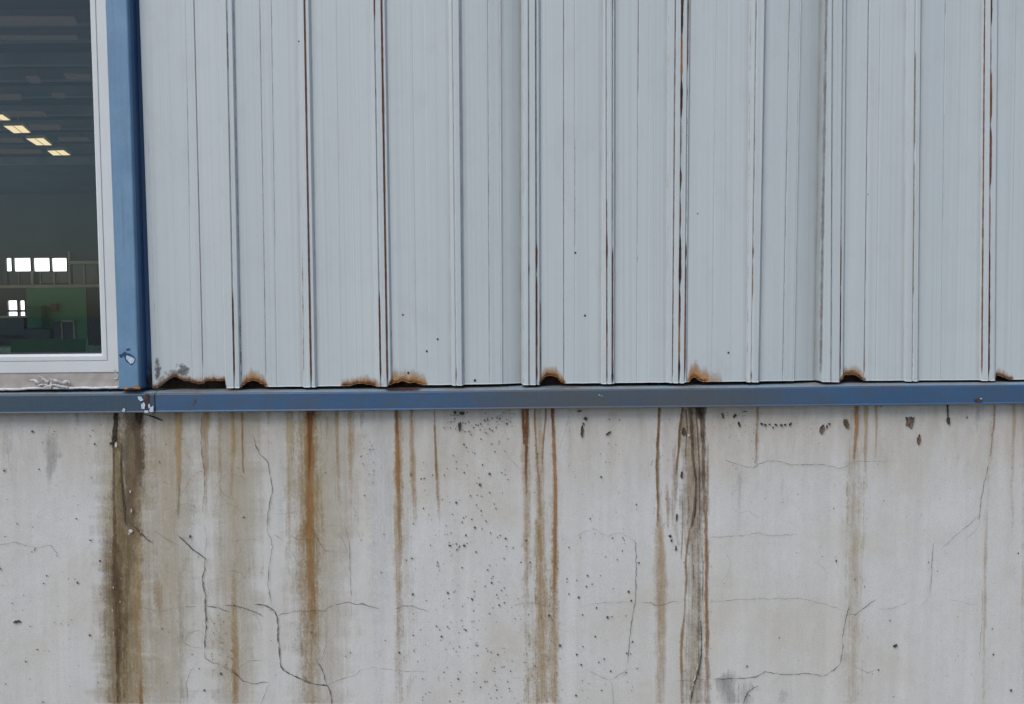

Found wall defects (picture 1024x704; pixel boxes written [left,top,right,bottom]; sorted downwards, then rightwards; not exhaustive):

water stain [105,413,163,704]
crack [178,418,205,509]
rust [124,295,268,390]
crack [119,439,422,704]
rust [341,0,427,391]
rust [522,409,557,701]
rust [535,243,565,384]
rust [674,0,689,190]
rust [656,407,709,703]
rust [672,203,710,382]
crack [691,602,872,702]
rust [981,0,1013,380]